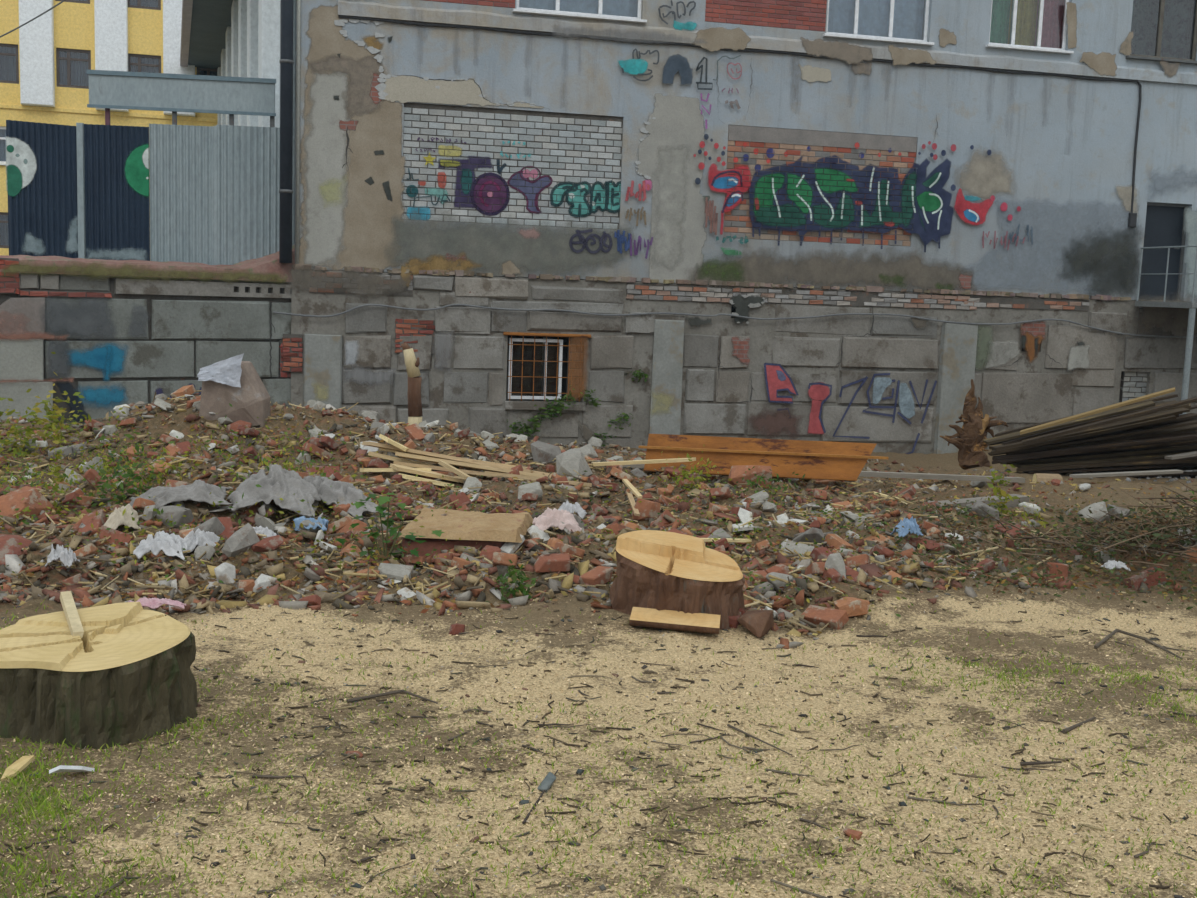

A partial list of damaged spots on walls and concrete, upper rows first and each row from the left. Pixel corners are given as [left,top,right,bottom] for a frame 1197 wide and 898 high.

flaking render [693,27,751,51]
flaking render [888,28,957,65]
flaking render [1067,2,1134,76]
flaking render [299,5,544,271]